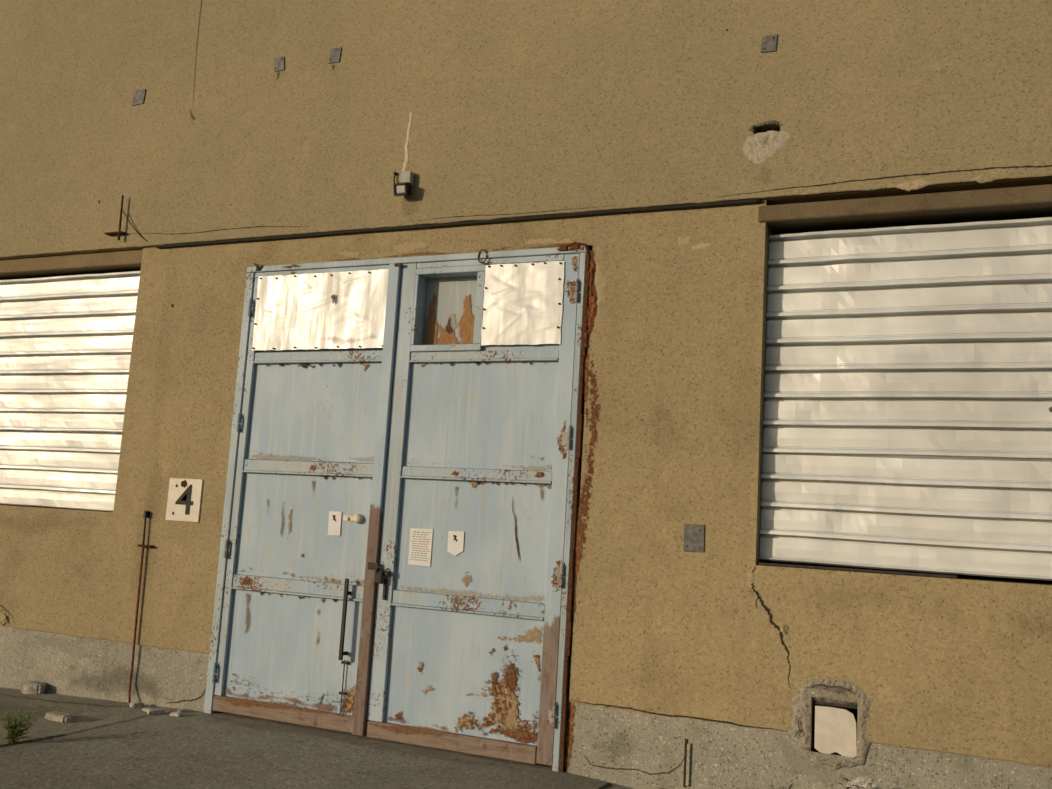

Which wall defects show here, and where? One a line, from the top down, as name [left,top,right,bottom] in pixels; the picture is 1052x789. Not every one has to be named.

spalling [743,120,789,164]
rust [551,349,600,616]
crack [746,567,791,689]
rust [220,673,356,716]
rust [371,627,543,744]
rust [565,702,576,768]
spalling [788,677,879,789]